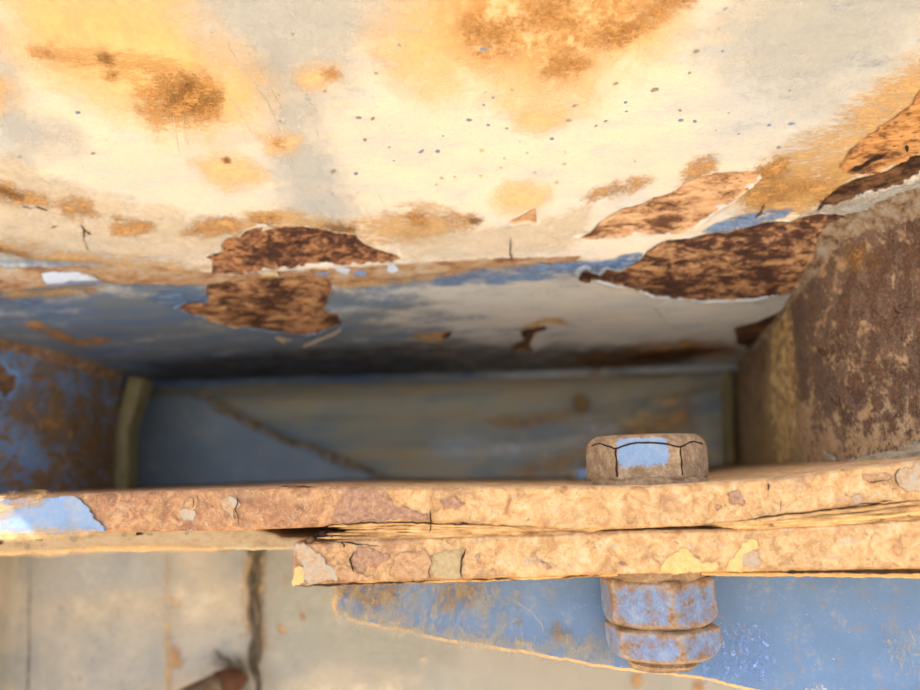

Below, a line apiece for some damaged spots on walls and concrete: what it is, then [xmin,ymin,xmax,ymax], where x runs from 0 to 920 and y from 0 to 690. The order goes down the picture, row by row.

corrosion [22,0,255,126]
corrosion [398,0,696,96]
corrosion [26,321,111,346]
peeling [171,223,403,348]
peeling [571,155,920,349]
corrosion [767,309,799,463]
corrosion [818,221,920,453]
corrosion [0,528,53,539]
corrosion [178,496,199,521]
corrosion [221,496,241,522]
corrosion [292,489,606,637]
corrosion [661,462,920,574]